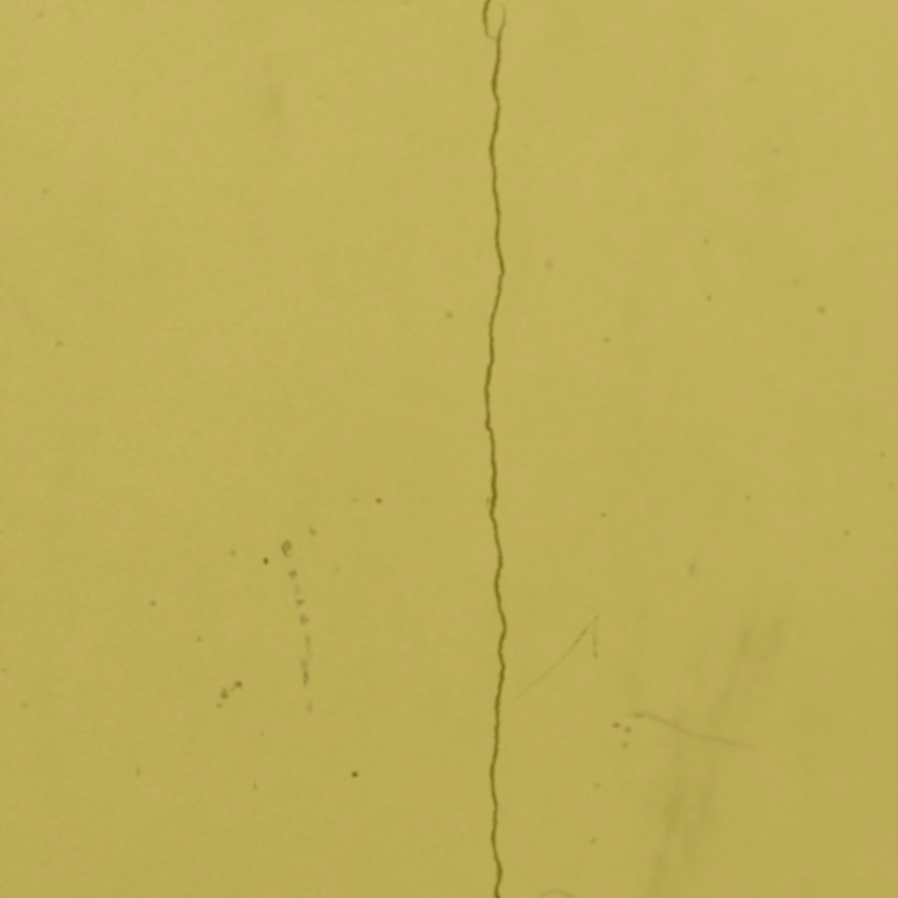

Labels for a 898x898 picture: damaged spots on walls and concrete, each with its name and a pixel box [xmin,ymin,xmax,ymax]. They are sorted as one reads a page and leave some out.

crack [482,0,507,898]